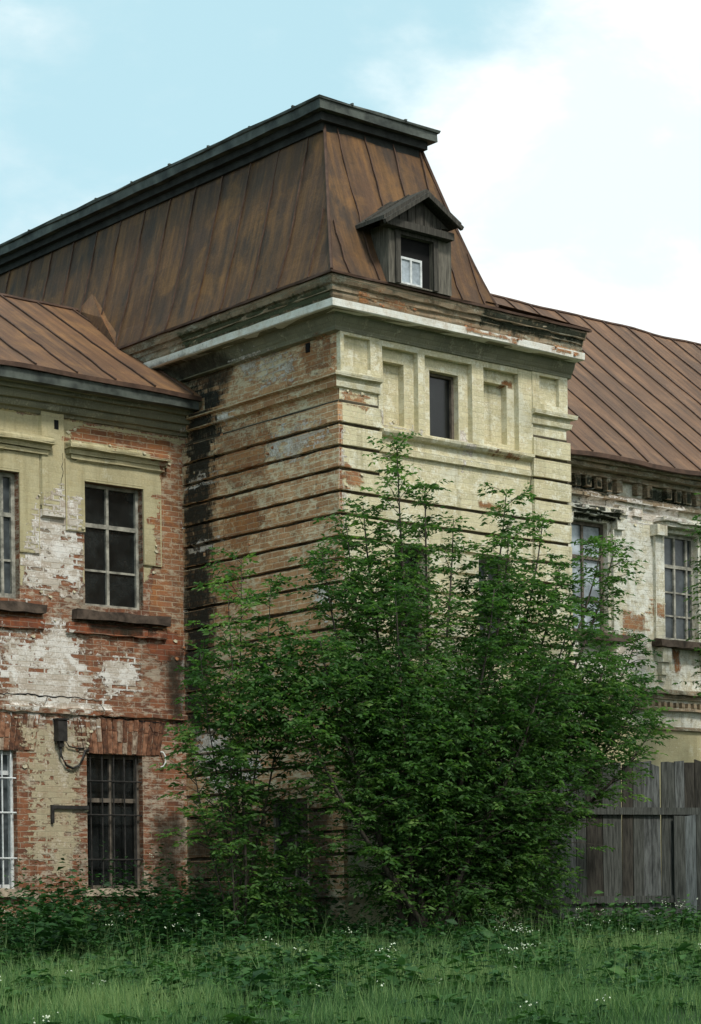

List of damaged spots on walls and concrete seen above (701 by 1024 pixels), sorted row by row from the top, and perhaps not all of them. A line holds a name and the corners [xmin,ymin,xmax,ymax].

spalling [300,334,335,374]
damp [156,348,297,751]
spalling [213,412,282,613]
damp [264,417,348,532]
spalling [327,390,425,584]
peeling [579,488,690,531]
peeling [0,425,187,881]
peeling [605,599,666,677]
crack [0,693,174,732]